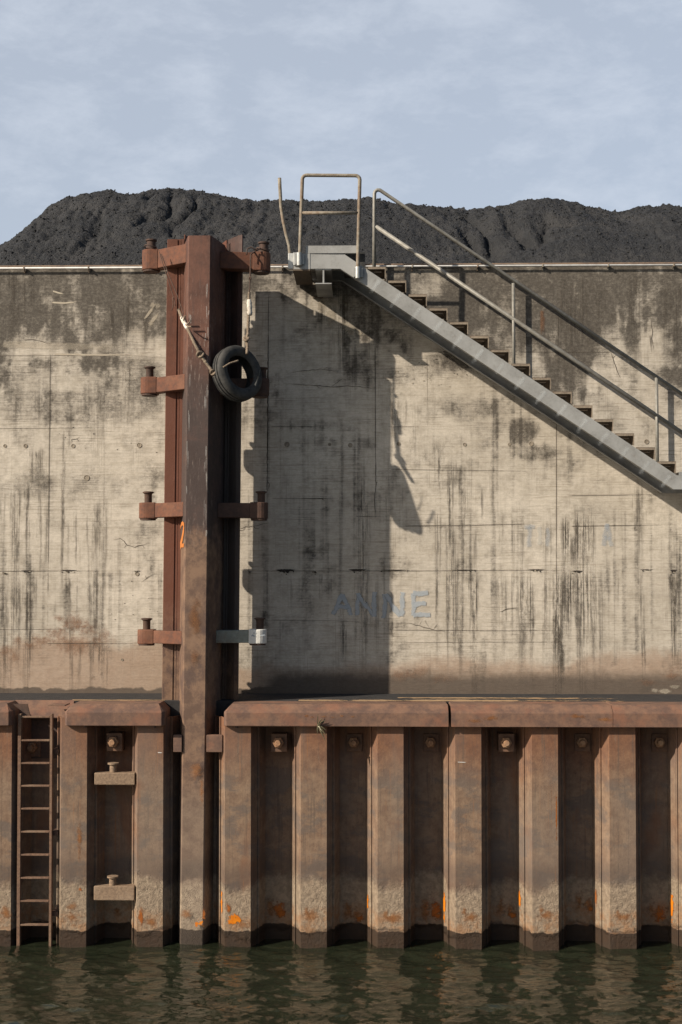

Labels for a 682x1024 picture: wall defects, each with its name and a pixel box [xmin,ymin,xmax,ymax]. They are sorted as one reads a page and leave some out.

damp [144,303,160,334]
damp [319,298,362,335]
damp [562,520,594,558]
damp [4,587,31,645]
damp [553,580,588,662]
corrosion [221,891,246,925]
corrosion [421,894,445,923]
corrosion [649,895,674,922]